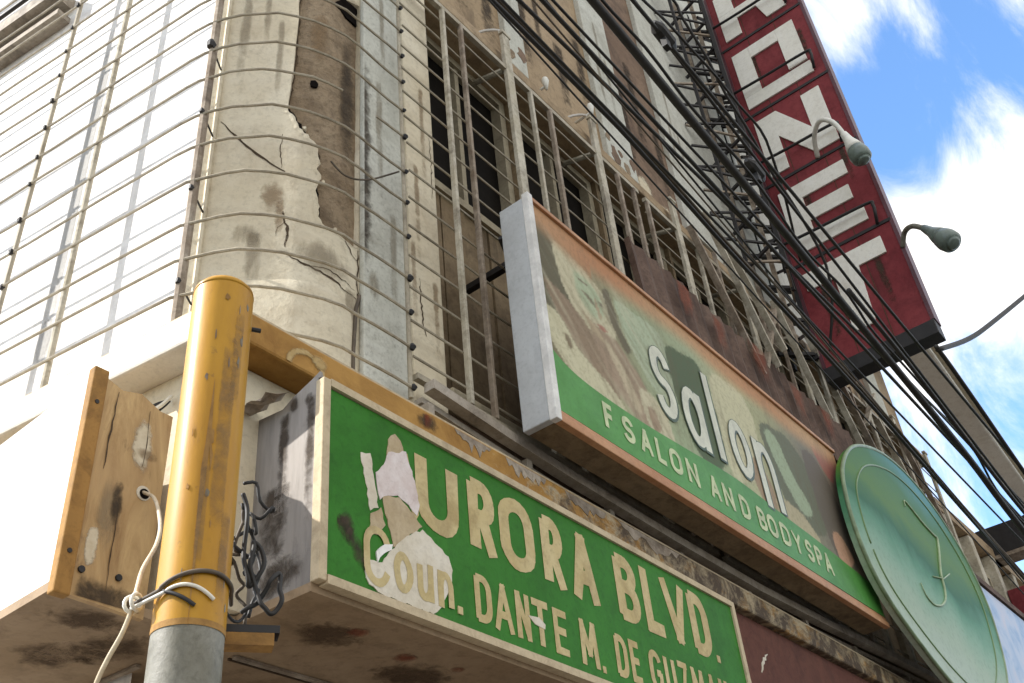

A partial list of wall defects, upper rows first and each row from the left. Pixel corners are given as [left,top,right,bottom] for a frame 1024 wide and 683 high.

crack [221,0,306,172]
flaking render [283,0,358,249]
crack [275,211,359,299]
peeling [454,428,491,457]
peeling [506,457,546,486]
peeling [565,490,606,519]
peeling [618,520,679,558]
damp [23,581,138,666]